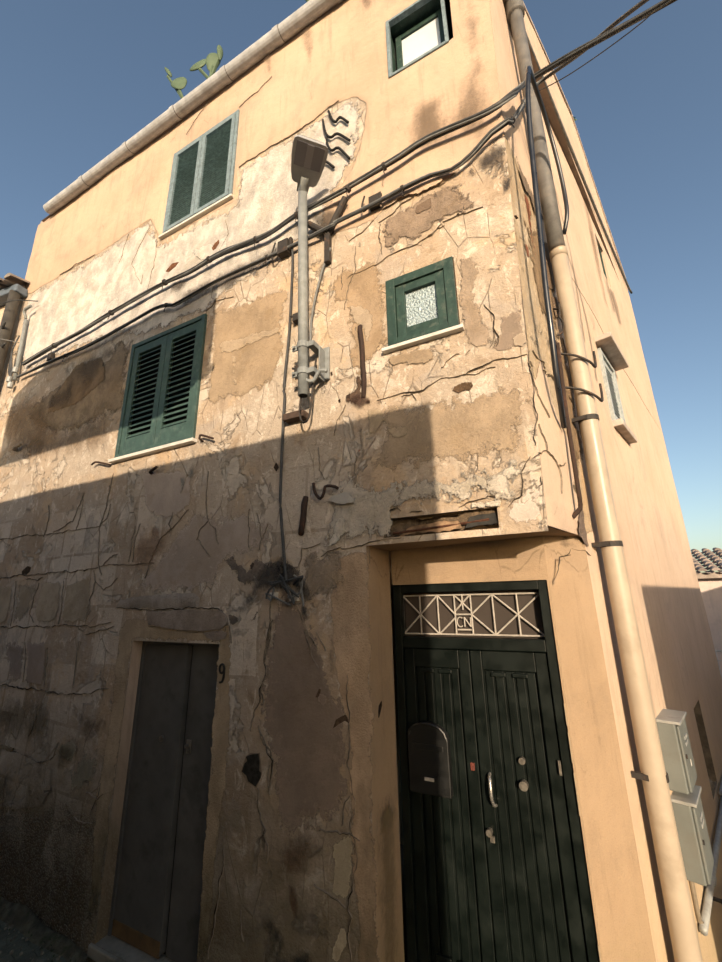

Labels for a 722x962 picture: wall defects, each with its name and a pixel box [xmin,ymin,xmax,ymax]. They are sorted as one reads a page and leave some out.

peeling [19,101,362,433]
crack [318,404,346,480]
corrosion [352,395,369,406]
peeling [286,257,541,600]
crack [377,305,586,508]
crack [0,471,232,763]
spalling [226,556,267,584]
crack [296,537,401,575]
crack [250,586,276,864]
crack [313,675,360,962]
peeling [332,928,347,962]
peeling [332,836,353,899]